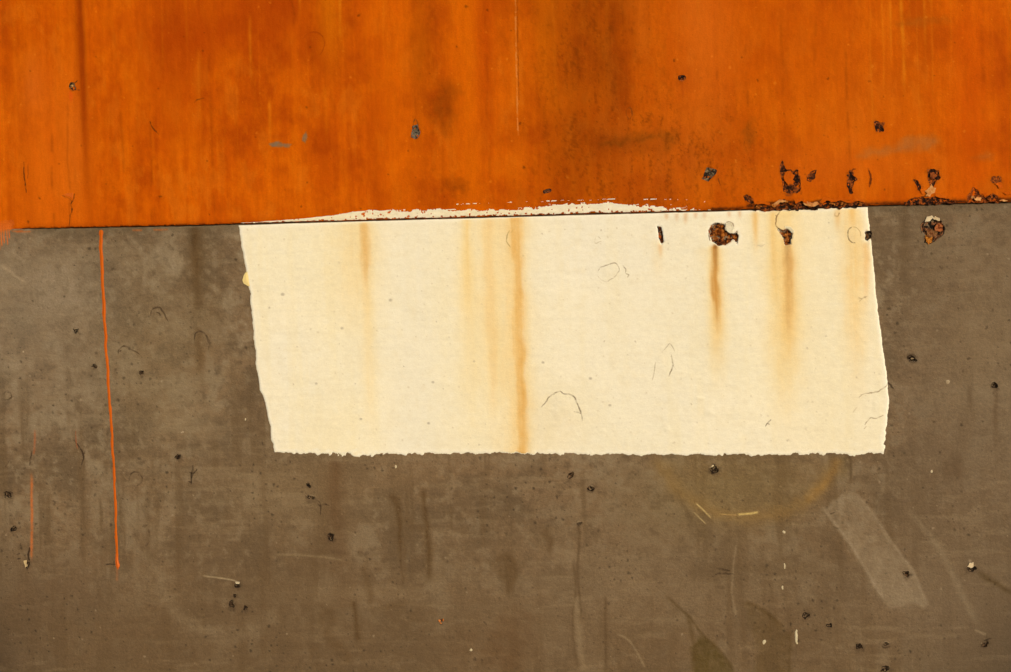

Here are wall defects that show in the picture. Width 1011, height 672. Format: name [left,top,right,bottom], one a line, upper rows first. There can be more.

rust [308,221,406,447]
rust [452,217,551,454]
rust [646,237,672,291]
rust [662,212,709,226]
rust [692,208,880,446]
peeling [707,158,1011,248]